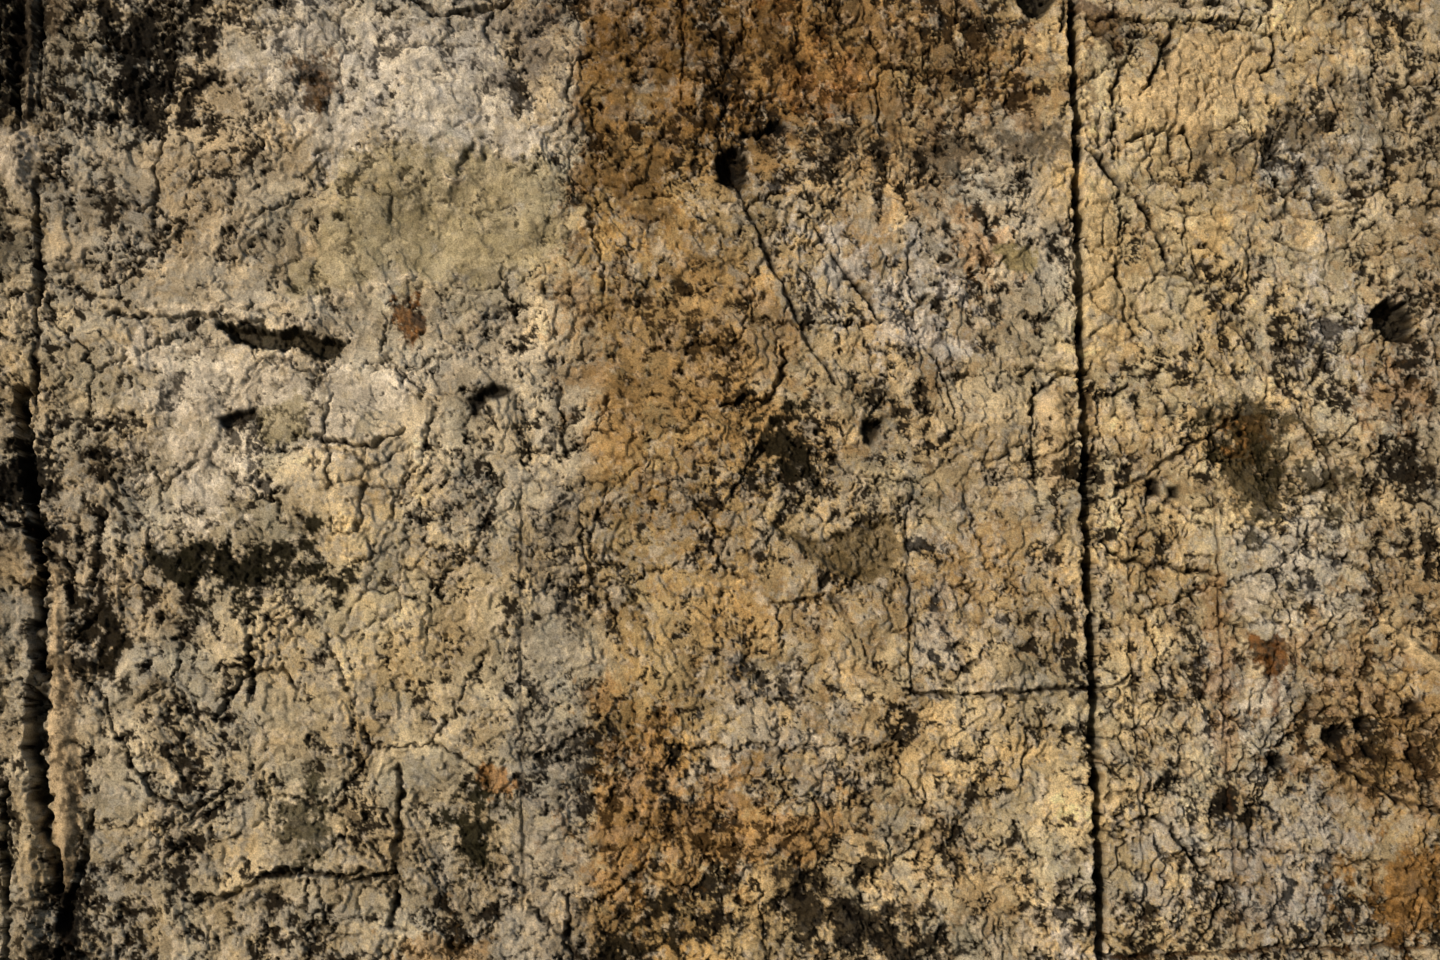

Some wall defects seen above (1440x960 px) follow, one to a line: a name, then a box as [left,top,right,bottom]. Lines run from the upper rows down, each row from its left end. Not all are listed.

corrosion [387,288,431,356]
crack [900,414,1440,960]
corrosion [1192,553,1440,960]